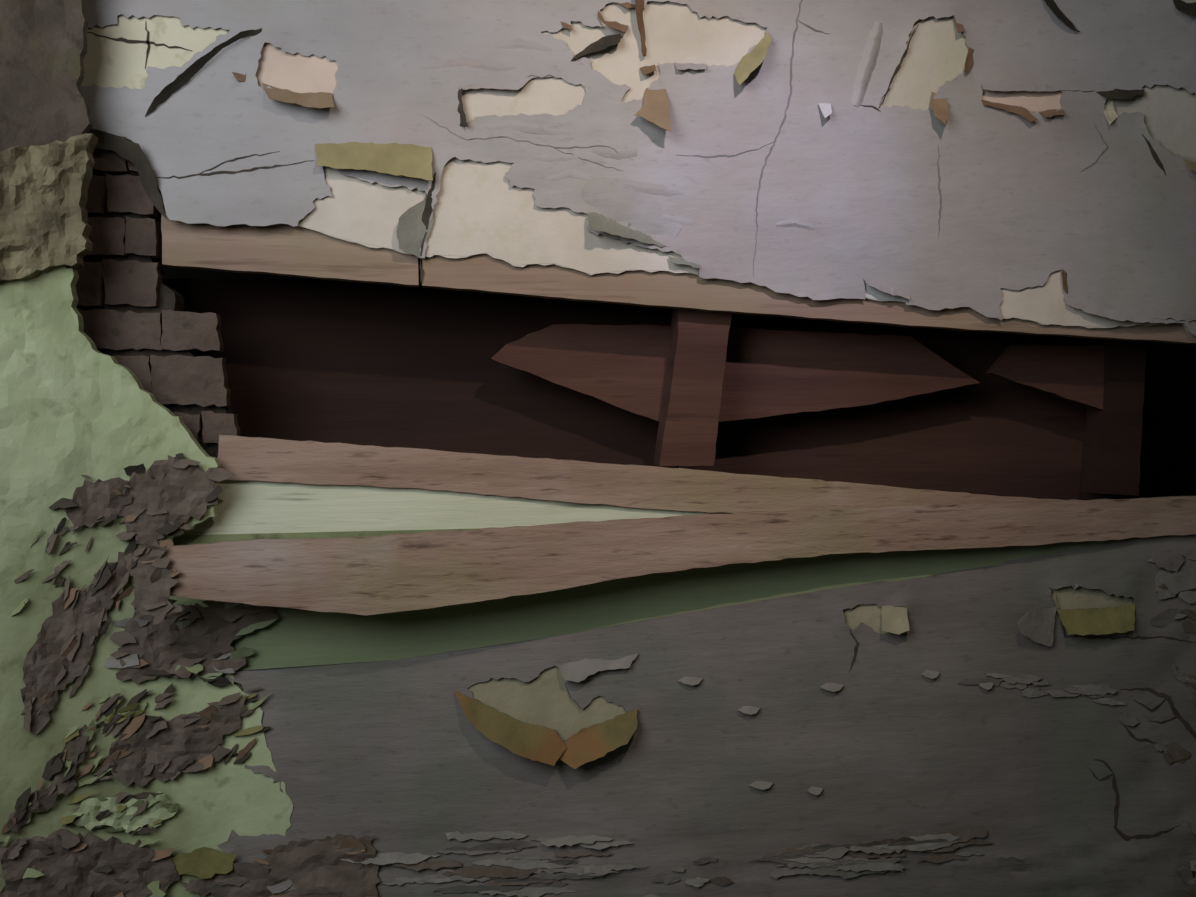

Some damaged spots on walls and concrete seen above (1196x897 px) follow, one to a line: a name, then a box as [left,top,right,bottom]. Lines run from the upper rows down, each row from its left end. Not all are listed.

peeling [81,15,338,117]
peeling [457,75,585,127]
peeling [541,0,772,131]
crack [683,0,830,264]
peeling [878,16,974,125]
peeling [980,83,1196,175]
peeling [999,269,1186,327]
flaking render [0,129,733,897]
peeling [820,604,910,692]
peeling [1018,586,1135,647]
crack [1120,688,1196,743]
crack [1087,759,1180,841]